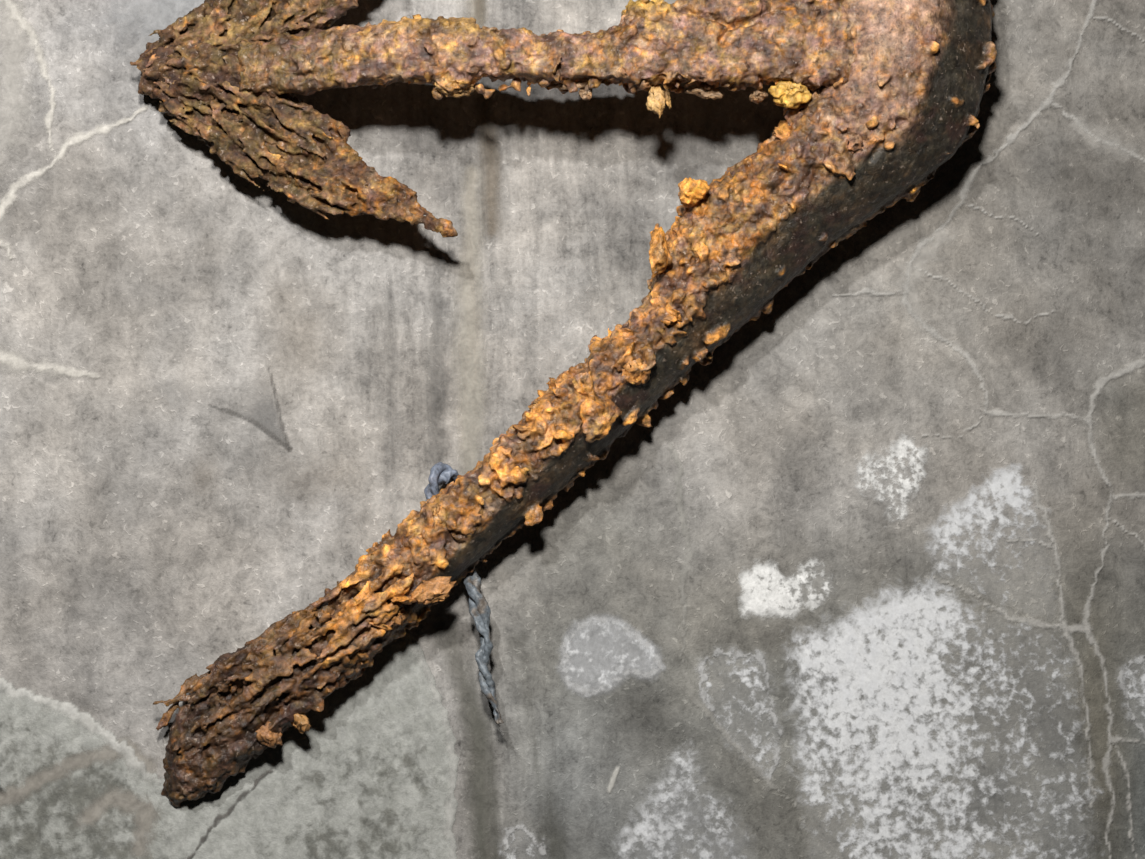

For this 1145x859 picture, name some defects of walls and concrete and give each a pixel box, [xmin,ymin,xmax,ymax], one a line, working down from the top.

crack [0,0,147,259]
rust [637,79,671,119]
rust [749,80,812,140]
crack [0,349,100,378]
crack [833,0,1145,858]
water stain [857,435,927,521]
rust [387,576,456,630]
water stain [739,559,830,617]
water stain [560,617,663,695]
water stain [788,465,1102,859]
rust [255,712,311,748]
water stain [619,752,744,859]